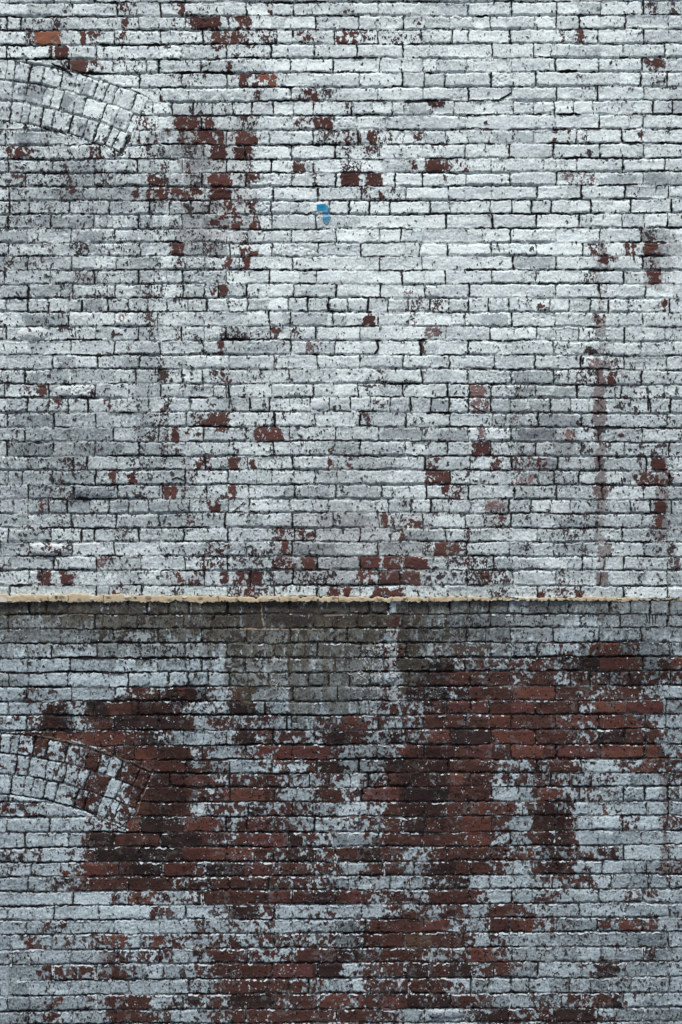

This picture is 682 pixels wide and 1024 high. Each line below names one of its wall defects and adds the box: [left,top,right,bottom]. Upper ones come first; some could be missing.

peeling [288,0,477,75]
water stain [179,187,330,273]
peeling [451,229,566,311]
peeling [577,226,679,295]